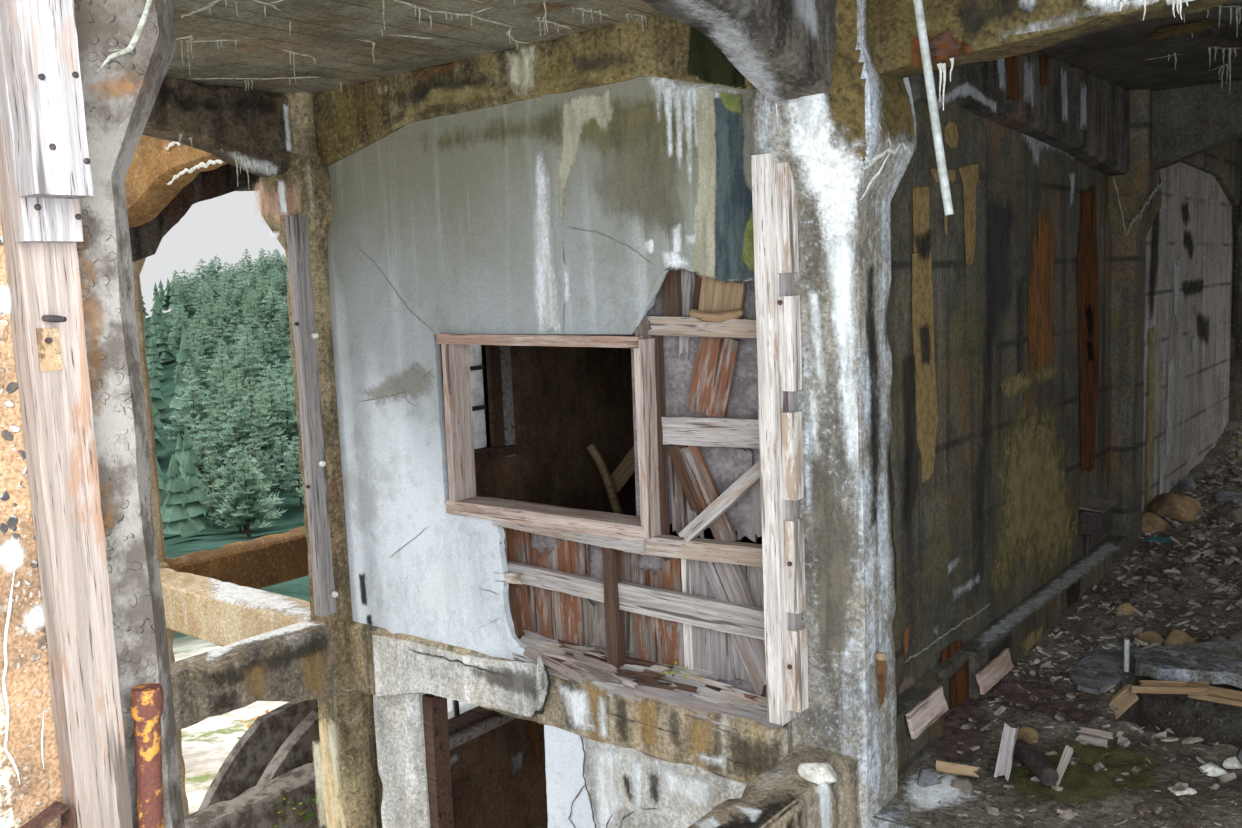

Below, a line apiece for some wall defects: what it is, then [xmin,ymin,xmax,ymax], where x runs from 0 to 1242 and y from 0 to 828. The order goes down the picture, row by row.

crack [97,0,342,93]
crack [357,0,647,63]
water stain [937,83,996,112]
water stain [997,58,1005,89]
water stain [1024,60,1034,107]
water stain [1061,69,1087,127]
water stain [1087,0,1194,20]
water stain [388,47,755,333]
water stain [809,293,825,452]
flaking render [503,620,521,648]